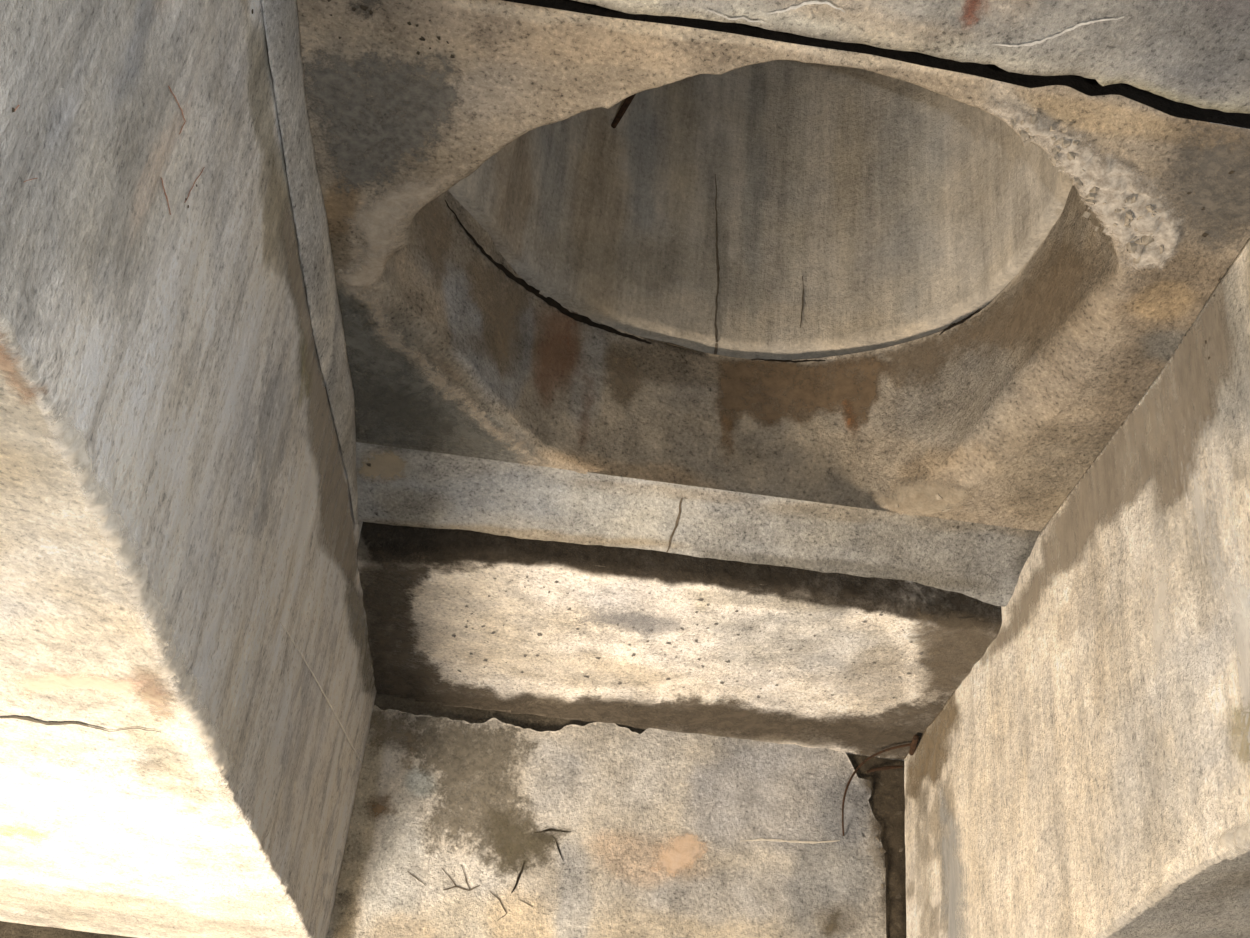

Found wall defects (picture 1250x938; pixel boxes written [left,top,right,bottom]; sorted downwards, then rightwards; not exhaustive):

rust [964,0,981,26]
water stain [305,20,461,196]
spalling [992,103,1180,269]
crack [666,498,683,552]
water stain [282,213,1229,938]
crack [0,716,160,732]